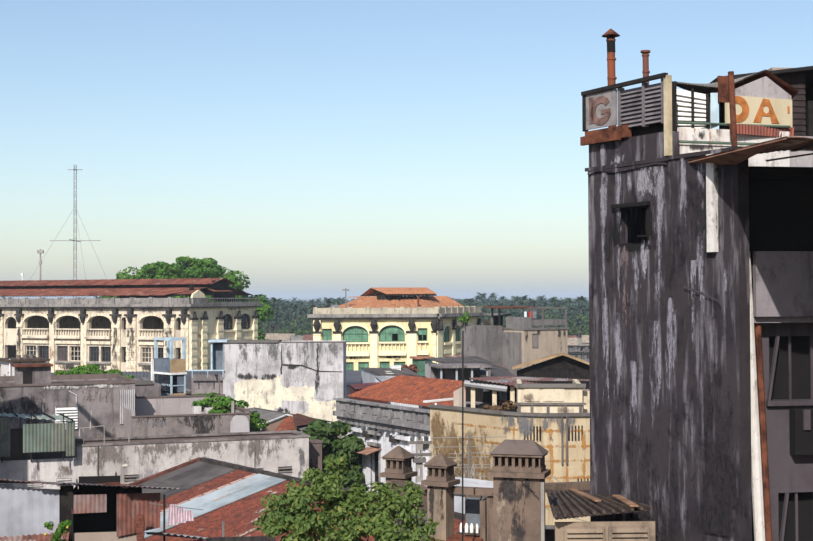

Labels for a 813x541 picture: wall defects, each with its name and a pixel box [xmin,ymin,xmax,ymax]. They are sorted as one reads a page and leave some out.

damp [680,158,721,321]
damp [600,144,676,421]
damp [237,342,362,394]
damp [44,384,118,429]
peeling [230,376,338,433]
damp [86,428,129,476]
damp [135,415,229,480]
damp [239,438,318,477]
corrosion [538,428,590,493]
damp [694,377,748,538]
damp [611,467,677,541]